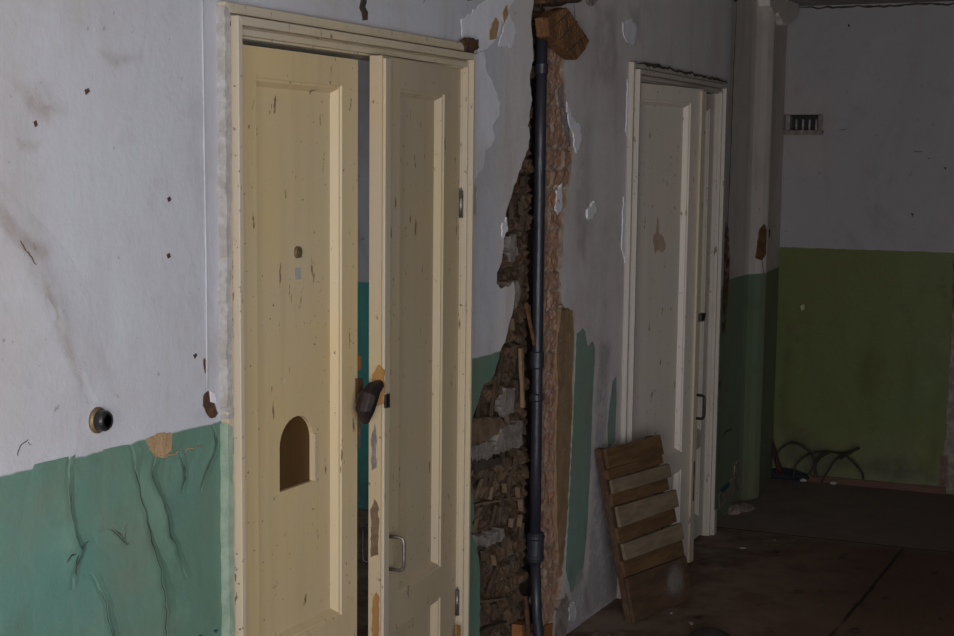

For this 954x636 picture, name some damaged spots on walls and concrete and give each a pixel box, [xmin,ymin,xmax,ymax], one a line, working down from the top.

peeling [460,0,516,197]
flaking render [586,201,597,220]
flaking render [146,432,173,458]
flaking render [471,3,595,636]
peeling [607,377,617,448]
flaking render [942,286,954,491]